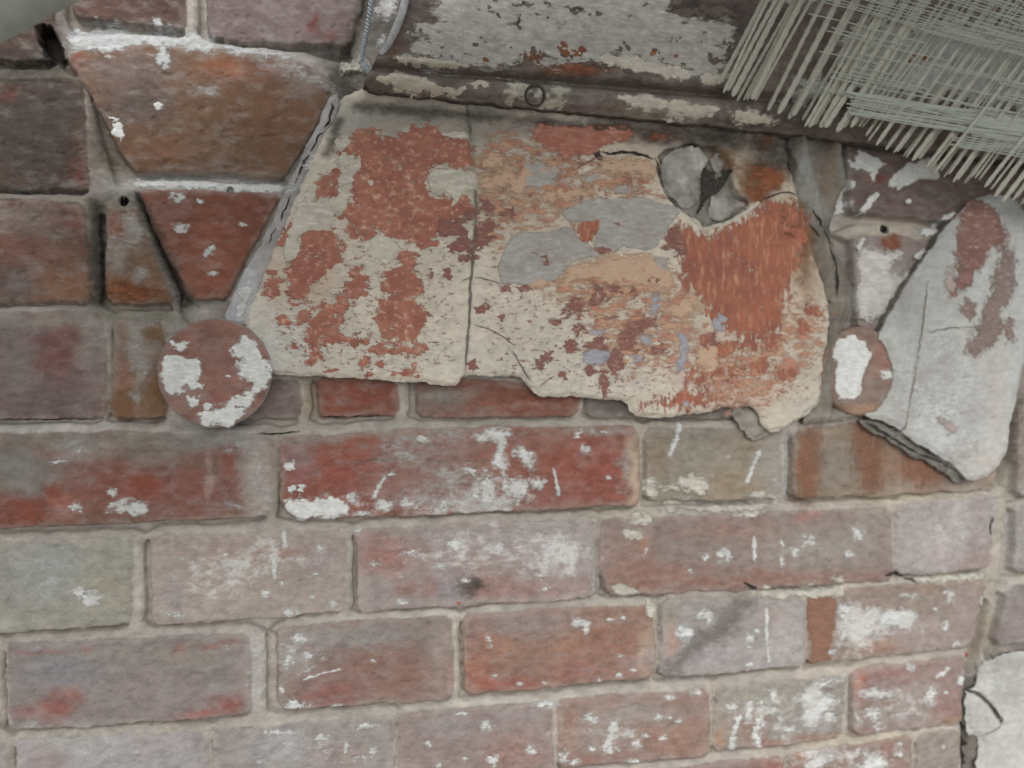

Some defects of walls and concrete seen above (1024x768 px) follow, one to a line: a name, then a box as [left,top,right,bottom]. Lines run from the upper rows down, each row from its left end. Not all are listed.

peeling [837,11,1024,112]
peeling [261,0,837,420]
crack [565,150,839,303]
crack [462,190,555,386]
peeling [944,197,1018,358]
damp [284,471,429,532]
damp [433,534,463,569]
damp [436,426,561,512]
damp [573,427,609,453]
crack [865,284,981,470]
peeling [936,415,959,436]
crack [960,689,1003,768]